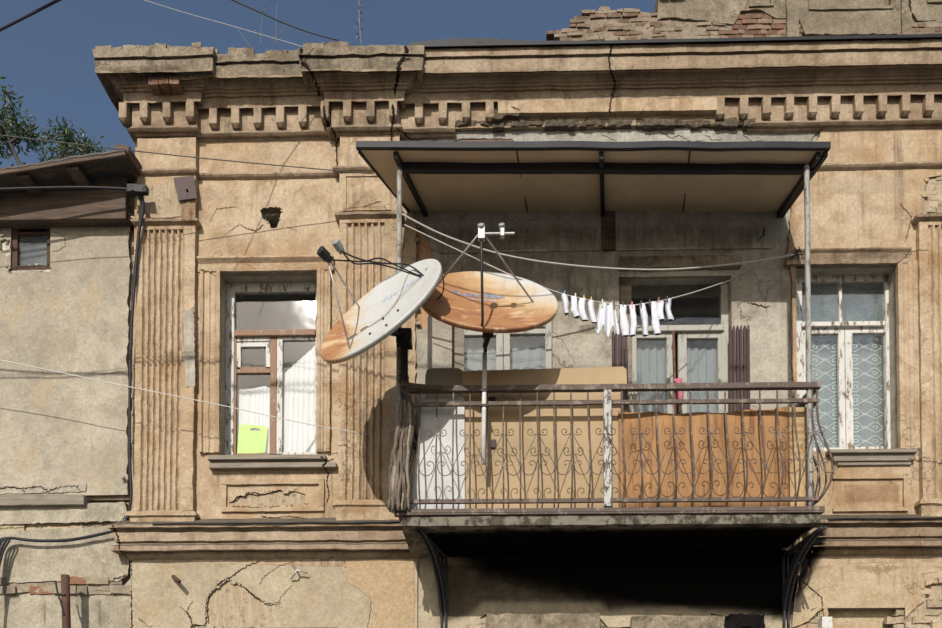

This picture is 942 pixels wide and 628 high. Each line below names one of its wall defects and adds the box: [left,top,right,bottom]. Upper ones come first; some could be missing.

spalling [652,13,786,39]
spalling [897,19,942,35]
crack [299,48,338,164]
crack [390,45,442,141]
crack [601,37,620,137]
hole [260,205,283,228]
spalling [921,176,942,214]
crack [0,484,80,492]
crack [229,487,303,519]
crack [321,456,333,504]
crack [179,561,294,628]
spalling [883,577,942,628]